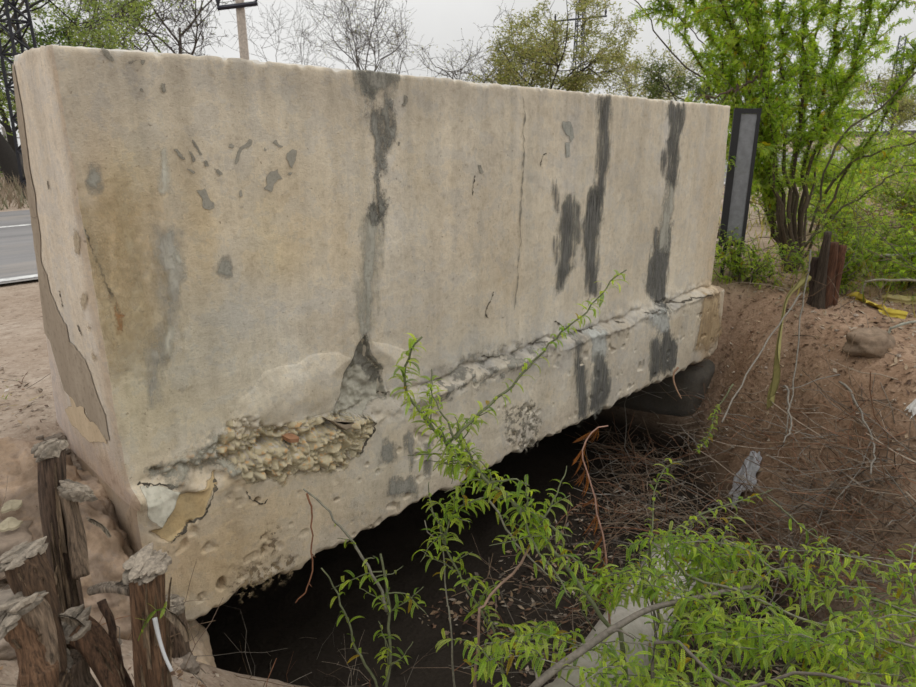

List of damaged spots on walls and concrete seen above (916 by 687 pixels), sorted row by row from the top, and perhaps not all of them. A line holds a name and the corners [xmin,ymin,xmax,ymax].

peeling [12,64,109,444]
leakage [356,70,398,341]
crack [485,100,547,318]
leakage [553,96,611,296]
leakage [646,101,686,381]
spalling [140,335,386,542]
leakage [575,327,611,419]